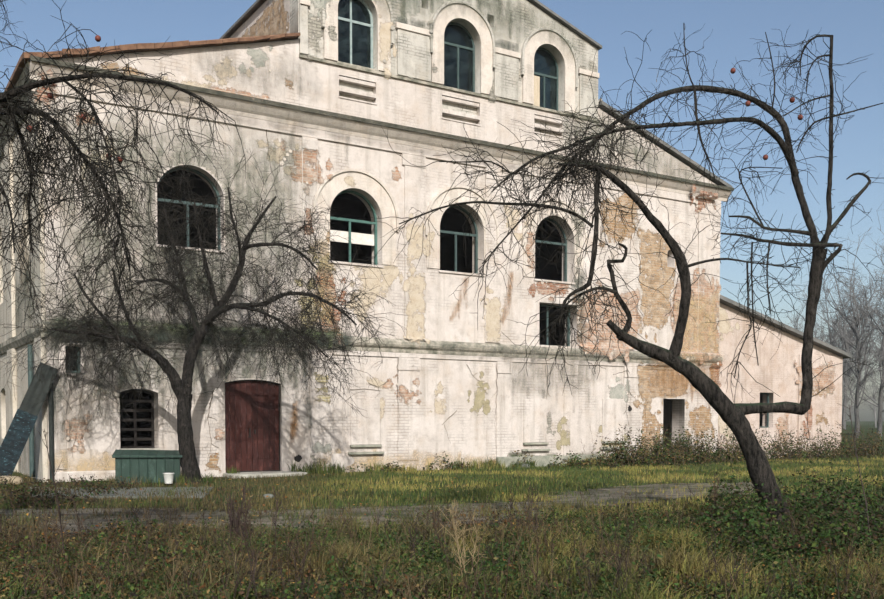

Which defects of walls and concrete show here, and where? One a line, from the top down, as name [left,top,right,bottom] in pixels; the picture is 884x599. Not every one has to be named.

spalling [163,0,289,101]
spalling [255,138,333,195]
spalling [690,184,718,212]
peeling [504,205,535,270]
peeling [294,213,435,348]
spalling [527,193,740,457]
spalling [314,372,332,404]
peeling [366,374,421,419]
peeling [429,382,446,415]
peeling [467,371,490,415]
spalling [61,413,92,454]
spalling [205,453,221,473]